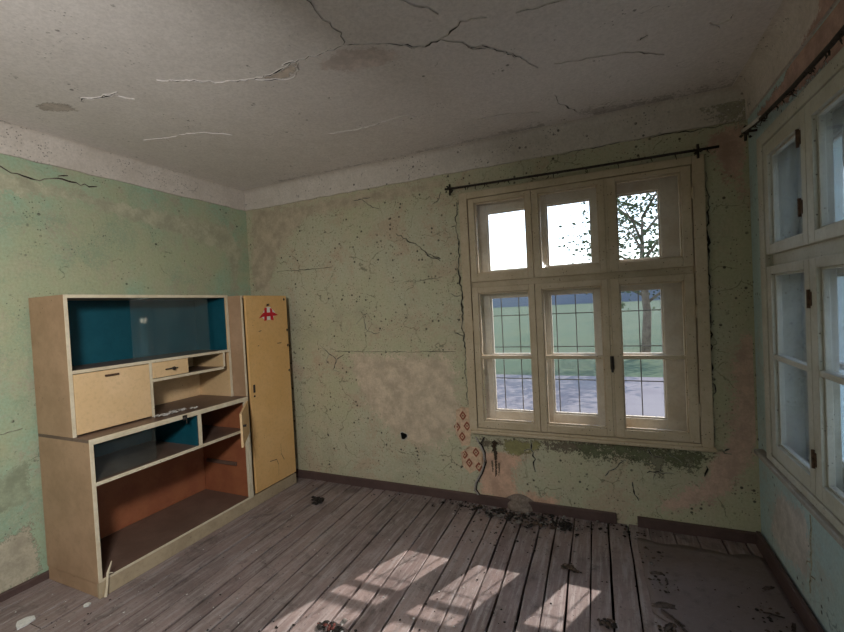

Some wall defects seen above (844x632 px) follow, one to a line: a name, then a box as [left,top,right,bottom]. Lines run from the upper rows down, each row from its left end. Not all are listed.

crack [156,0,664,84]
crack [80,91,135,101]
crack [0,165,97,188]
crack [319,192,469,405]
crack [704,172,732,477]
peeling [326,327,575,507]
leakage [476,438,717,479]
crack [605,449,682,501]